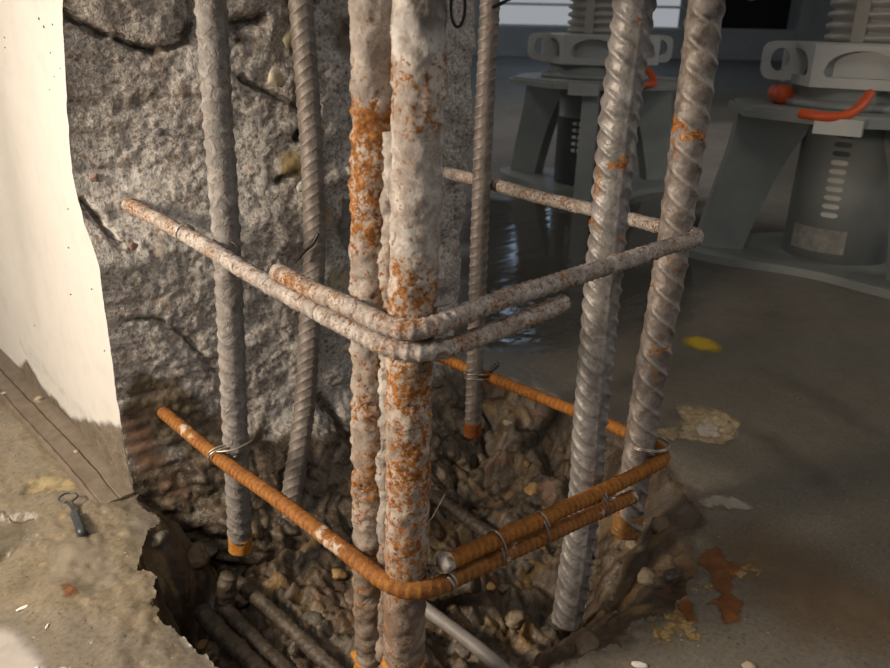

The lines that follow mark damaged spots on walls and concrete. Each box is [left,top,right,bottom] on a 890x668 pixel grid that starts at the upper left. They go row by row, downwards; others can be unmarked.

crack [62,7,193,52]
crack [79,199,120,243]
crack [123,317,208,381]
spalling [451,380,574,530]
spalling [603,430,624,482]
spalling [657,406,740,445]
crack [0,511,34,523]
spalling [136,494,355,668]
spalling [425,466,707,668]
rust [648,547,762,644]